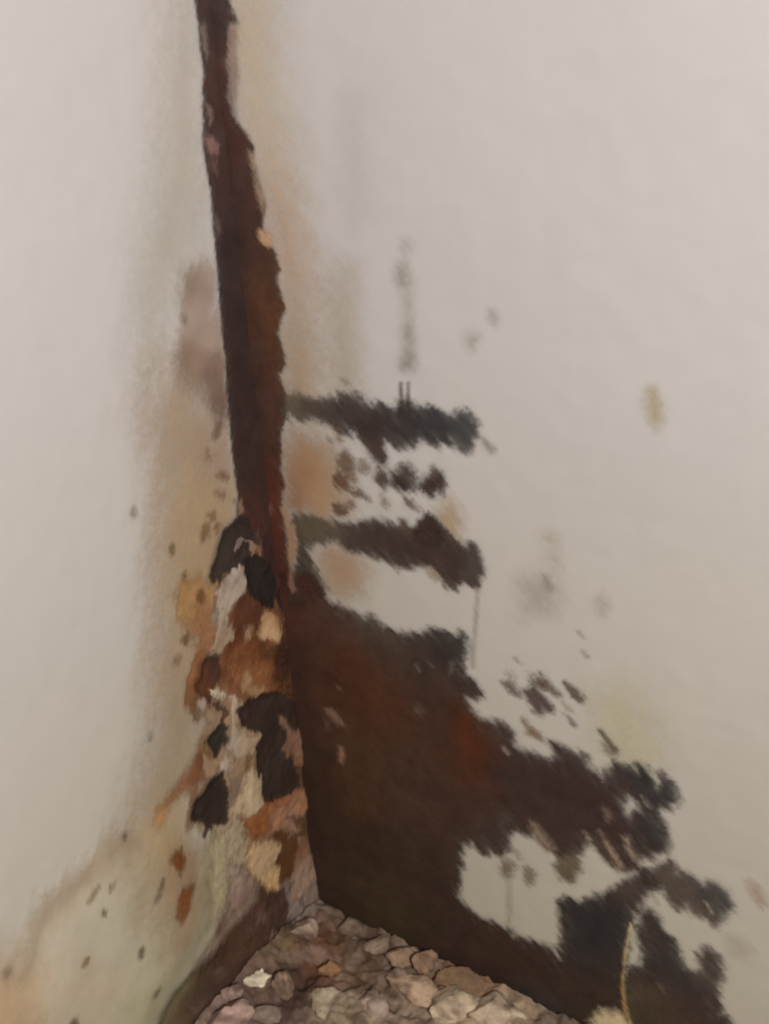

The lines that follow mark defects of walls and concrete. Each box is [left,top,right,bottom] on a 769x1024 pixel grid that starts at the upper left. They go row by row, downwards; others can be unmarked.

spalling [185,500,319,978]
leakage [135,0,734,1024]